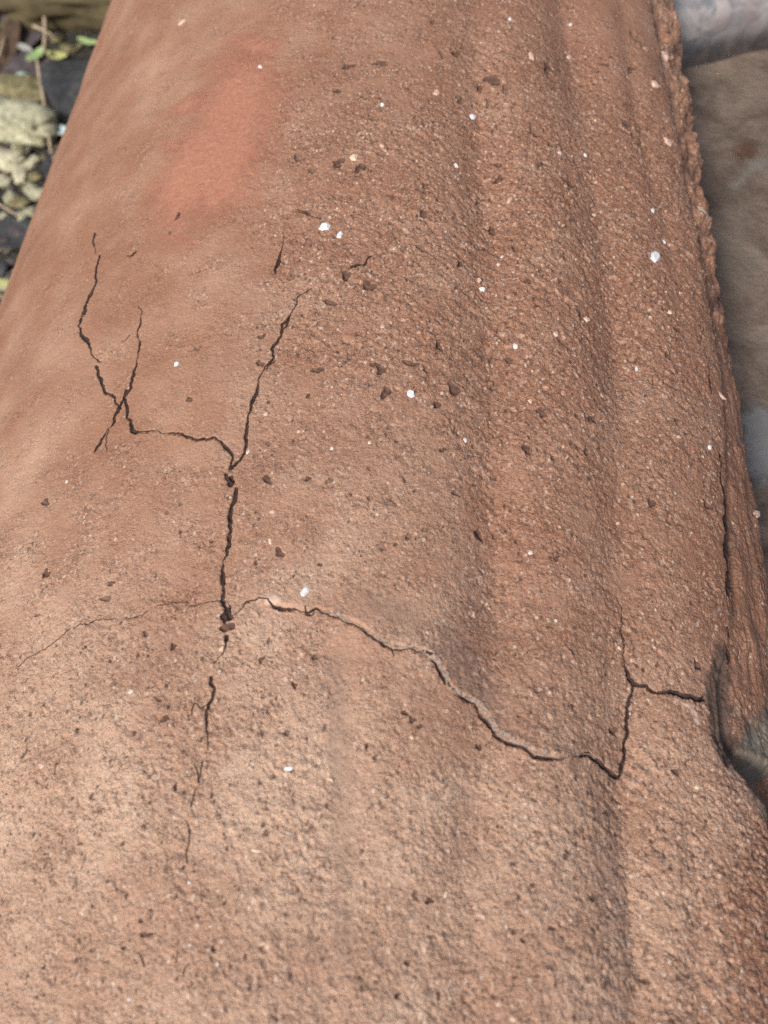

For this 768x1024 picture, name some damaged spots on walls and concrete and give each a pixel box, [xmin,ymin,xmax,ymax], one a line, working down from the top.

crack [695,327,712,394]
crack [15,232,704,863]
crack [719,454,730,596]
crack [724,626,732,680]